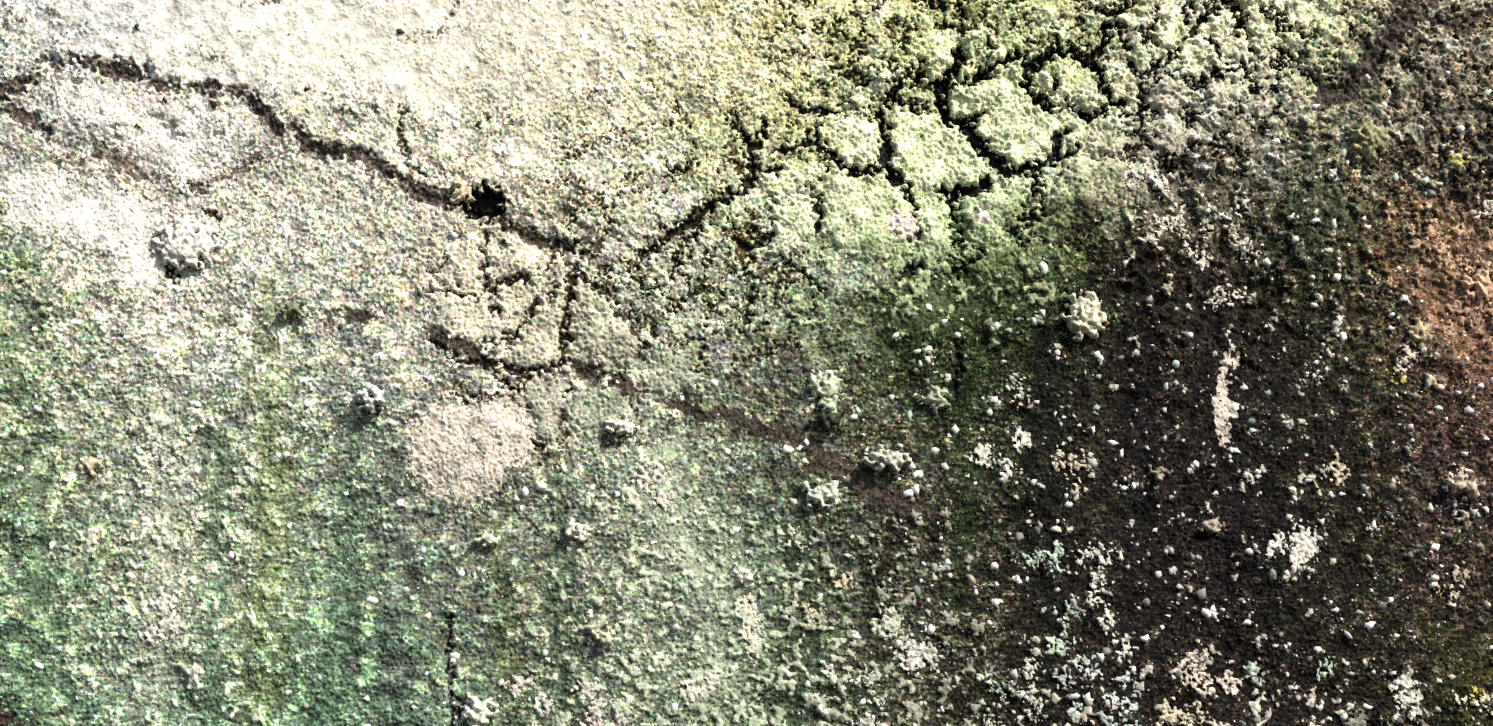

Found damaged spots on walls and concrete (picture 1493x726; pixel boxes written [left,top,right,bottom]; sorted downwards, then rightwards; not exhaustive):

crack [240,0,280,8]
crack [397,1,467,44]
crack [0,52,457,223]
crack [156,234,181,291]
damp [327,304,386,326]
damp [429,327,498,371]
damp [563,354,645,397]
crack [422,0,1244,452]
damp [926,177,1418,726]
damp [371,425,425,726]
damp [611,423,832,726]
damp [848,502,907,723]